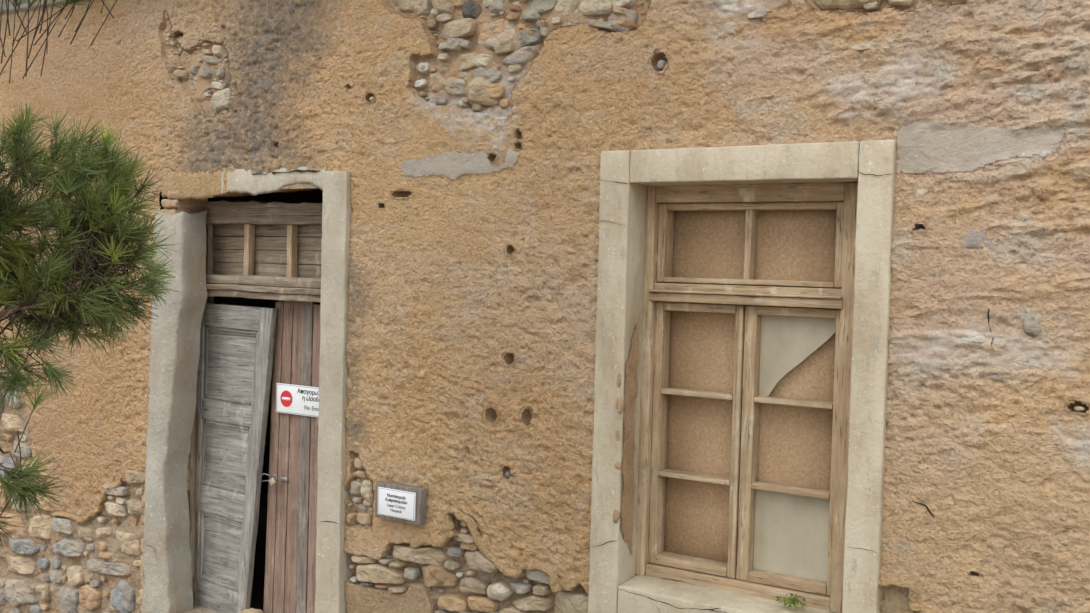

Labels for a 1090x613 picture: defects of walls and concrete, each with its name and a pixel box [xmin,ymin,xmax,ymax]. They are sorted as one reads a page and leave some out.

flaking render [804,0,969,15]
flaking render [381,0,651,119]
flaking render [30,443,125,523]
flaking render [410,506,562,593]
crack [620,589,726,613]
flaking render [878,576,934,613]